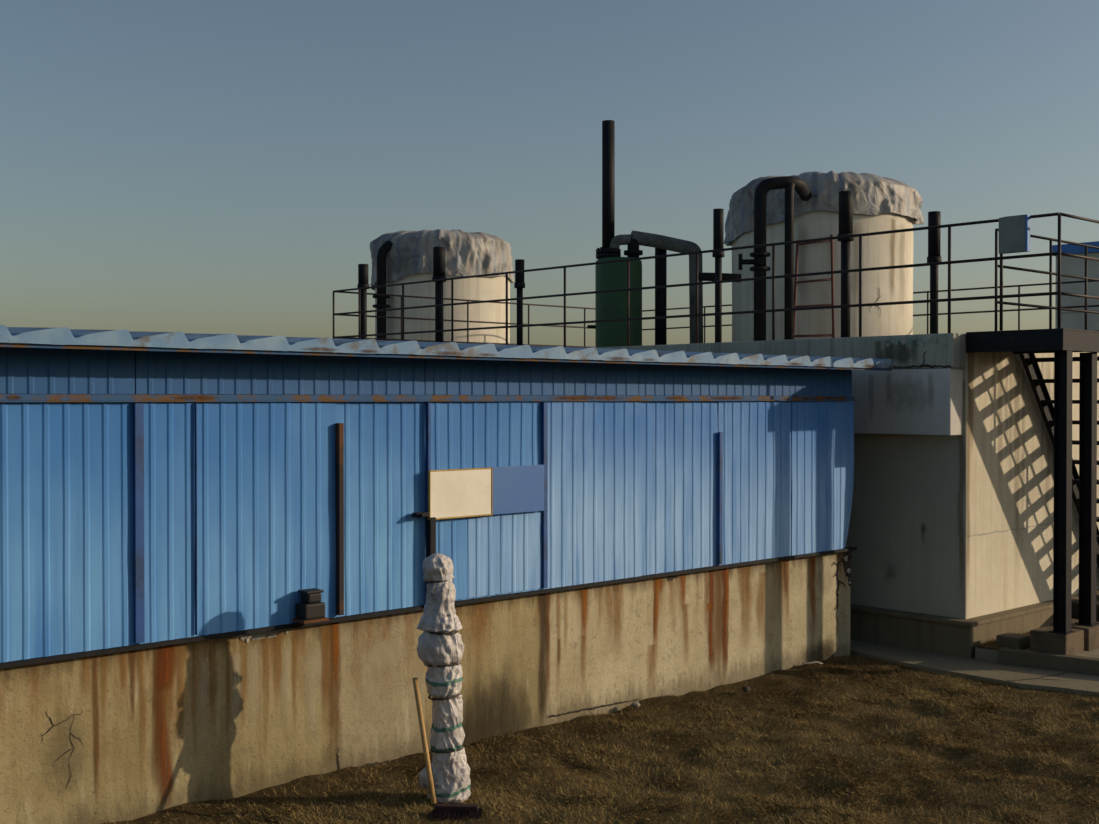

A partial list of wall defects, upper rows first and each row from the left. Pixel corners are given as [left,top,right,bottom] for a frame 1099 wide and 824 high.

rust [654,577,662,631]
rust [708,568,729,665]
crack [832,558,845,635]
crack [40,710,84,789]
rust [155,645,174,795]
rust [330,623,339,728]